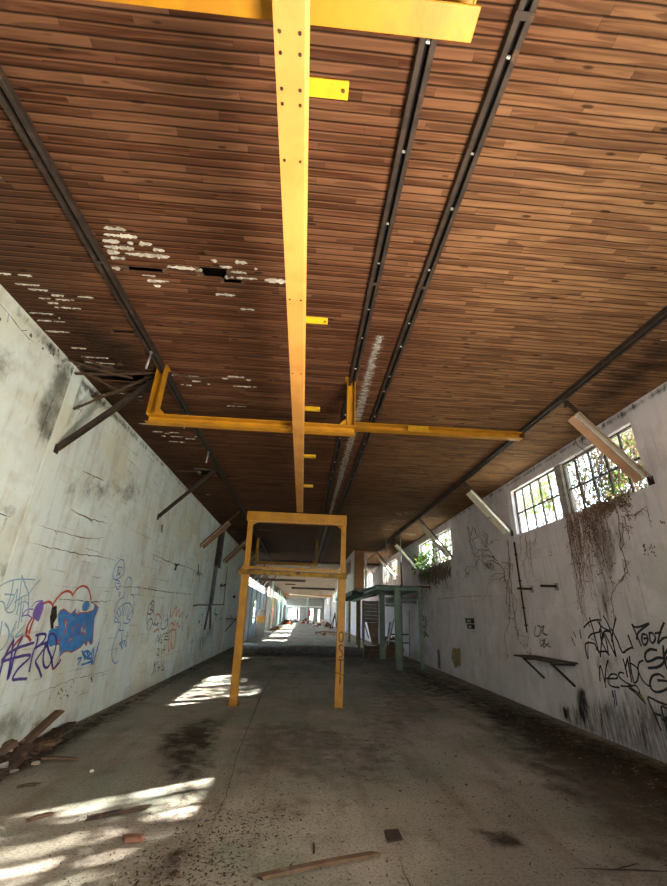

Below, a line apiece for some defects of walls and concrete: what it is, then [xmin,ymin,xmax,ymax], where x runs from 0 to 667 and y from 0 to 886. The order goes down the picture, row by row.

peeling [102,226,202,272]
peeling [211,259,286,284]
peeling [0,273,93,333]
water stain [39,368,69,439]